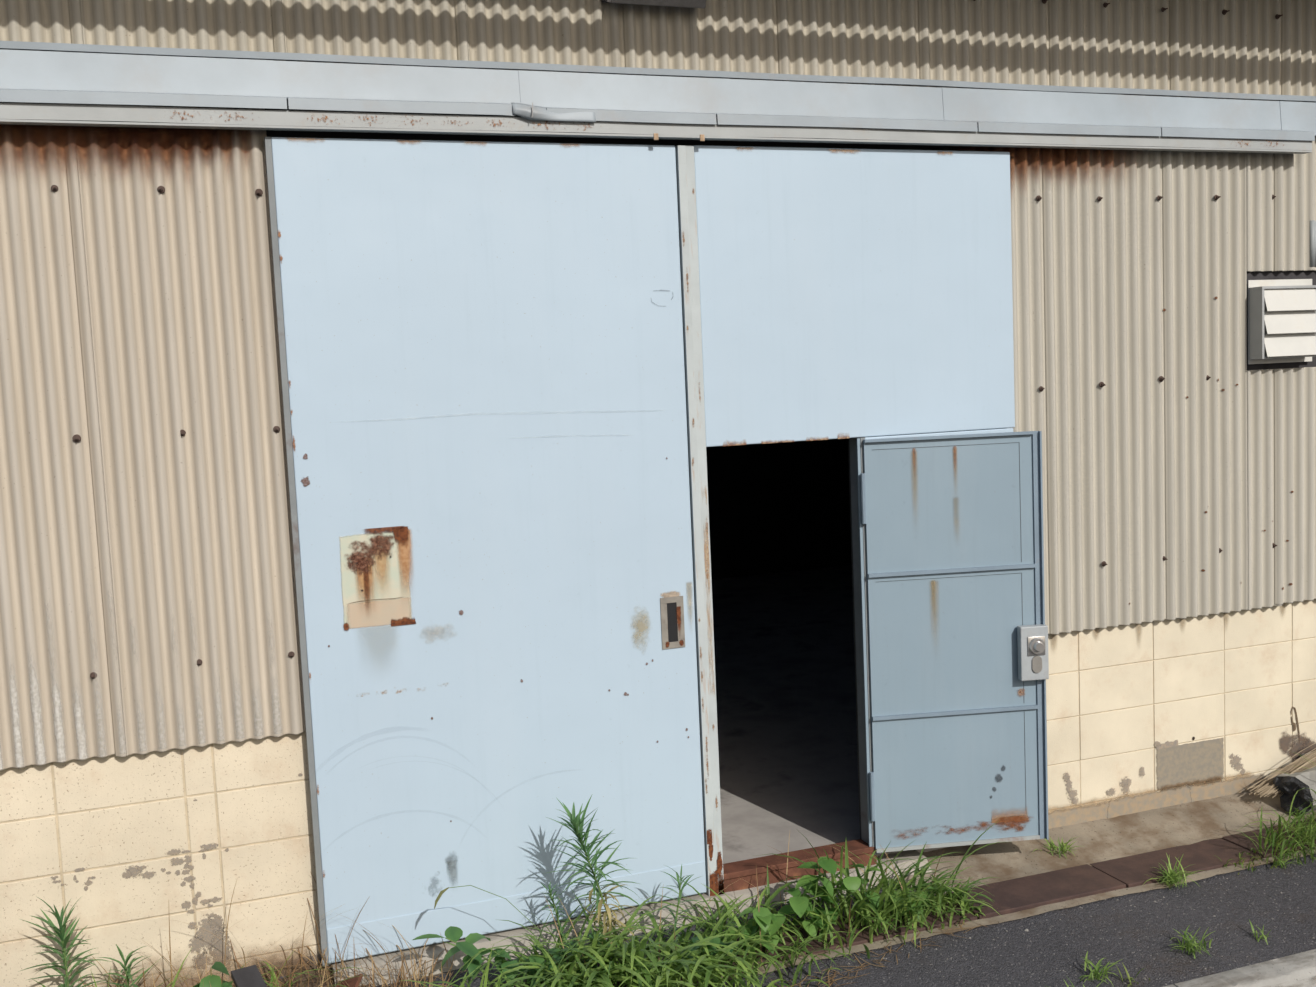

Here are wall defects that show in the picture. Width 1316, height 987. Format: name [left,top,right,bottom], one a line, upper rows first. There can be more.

corrosion [0,111,247,159]
corrosion [938,146,1113,178]
peeling [1048,738,1266,829]
corrosion [951,814,1028,832]
spalling [123,843,232,975]